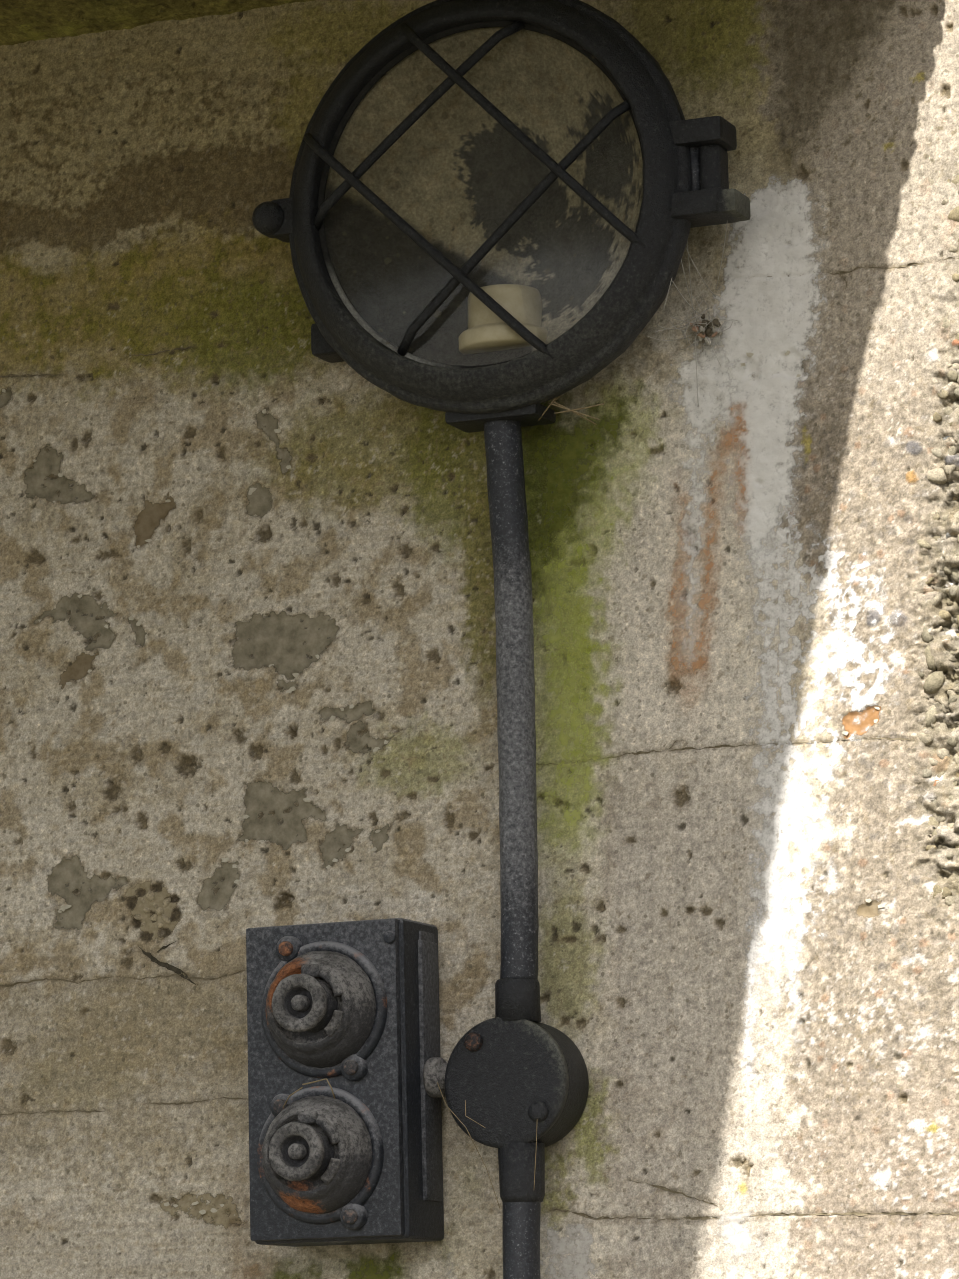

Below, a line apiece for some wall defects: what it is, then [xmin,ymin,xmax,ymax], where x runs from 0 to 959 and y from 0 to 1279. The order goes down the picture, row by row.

crack [767,257,959,293]
peeling [24,444,95,504]
peeling [133,492,176,548]
corrosion [668,406,746,673]
peeling [34,593,149,689]
peeling [232,611,339,693]
water stain [674,176,900,1080]
peeling [237,781,389,869]
peeling [48,856,180,941]
crack [549,1180,952,1220]